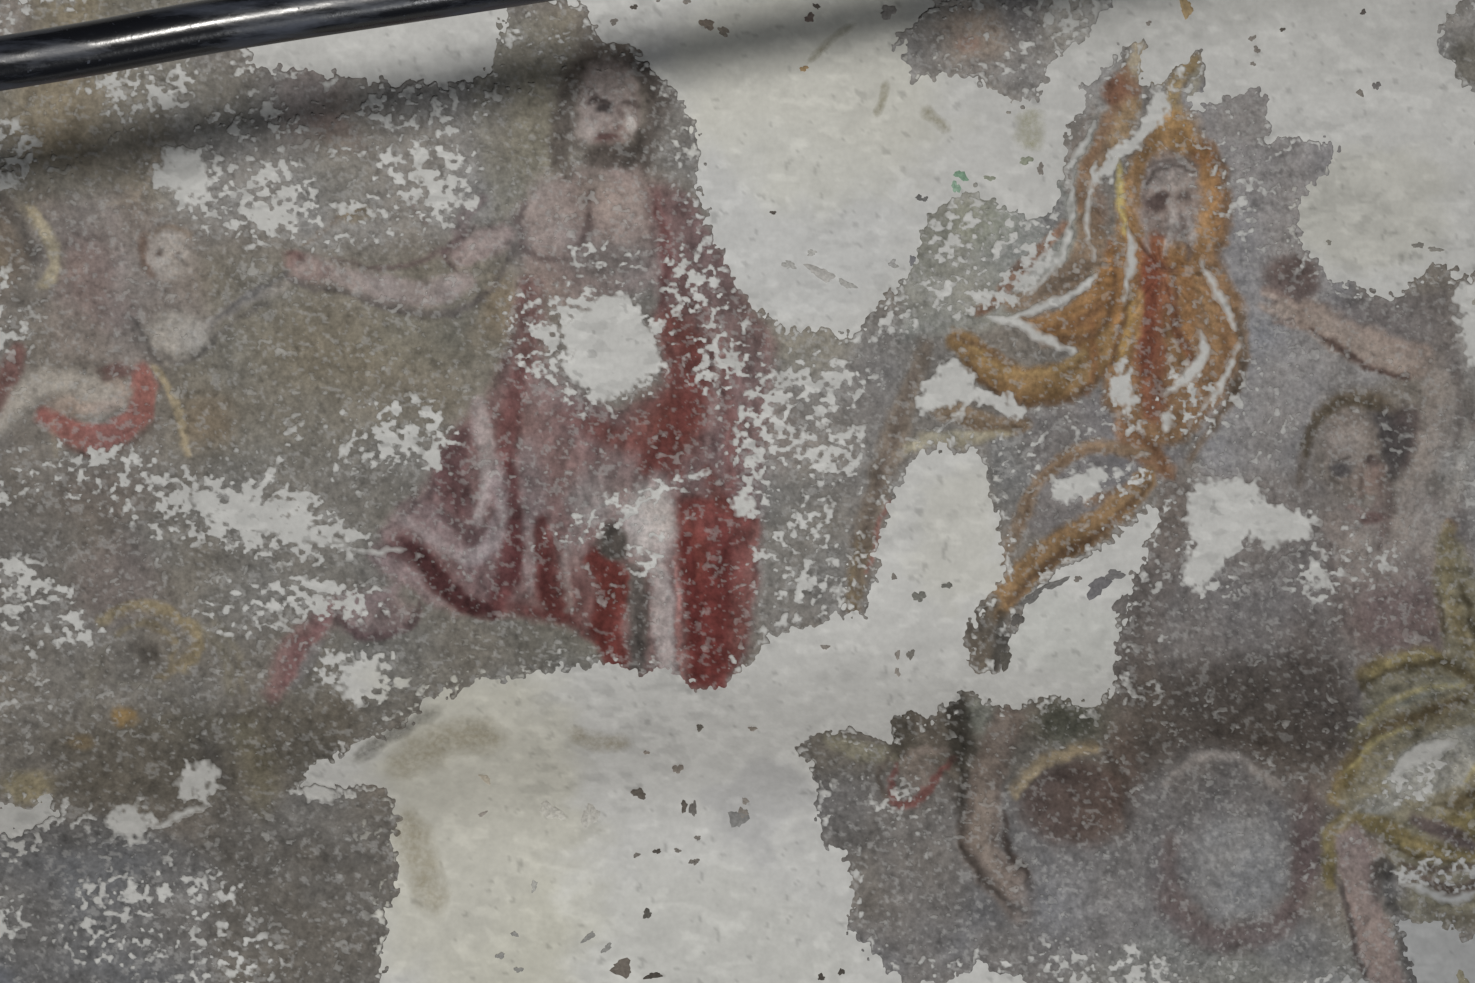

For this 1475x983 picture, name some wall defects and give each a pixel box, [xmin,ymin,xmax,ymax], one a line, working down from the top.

peeling [0,0,884,983]
peeling [880,0,1113,114]
peeling [795,38,1475,983]
peeling [1179,0,1194,20]